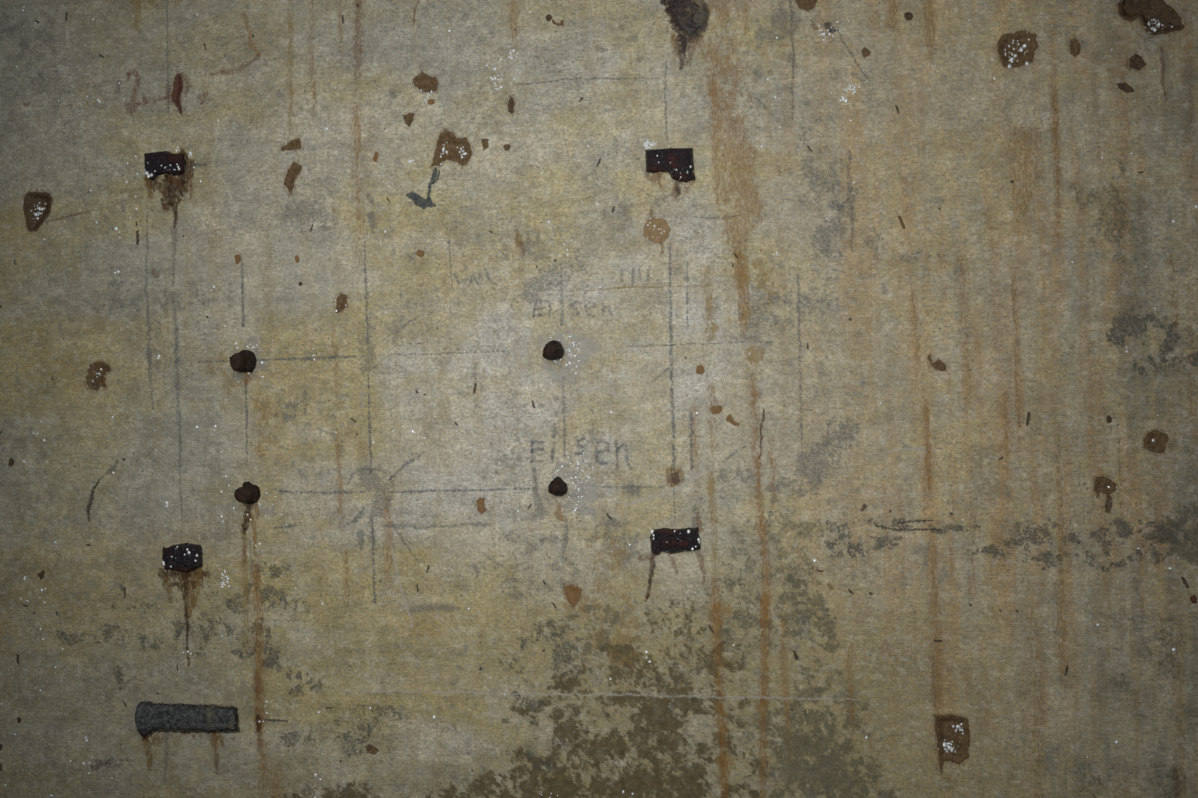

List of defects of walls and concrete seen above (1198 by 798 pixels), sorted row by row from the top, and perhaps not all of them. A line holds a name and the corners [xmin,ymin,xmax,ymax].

rust [145,148,194,237]
rust [643,211,670,256]
rust [646,151,688,196]
rust [660,0,776,320]
leakage [967,506,1198,571]
rust [158,547,209,666]
rust [241,504,277,795]
rust [639,475,735,796]
leakage [426,419,980,798]
rust [137,701,240,774]
leakage [273,780,380,798]